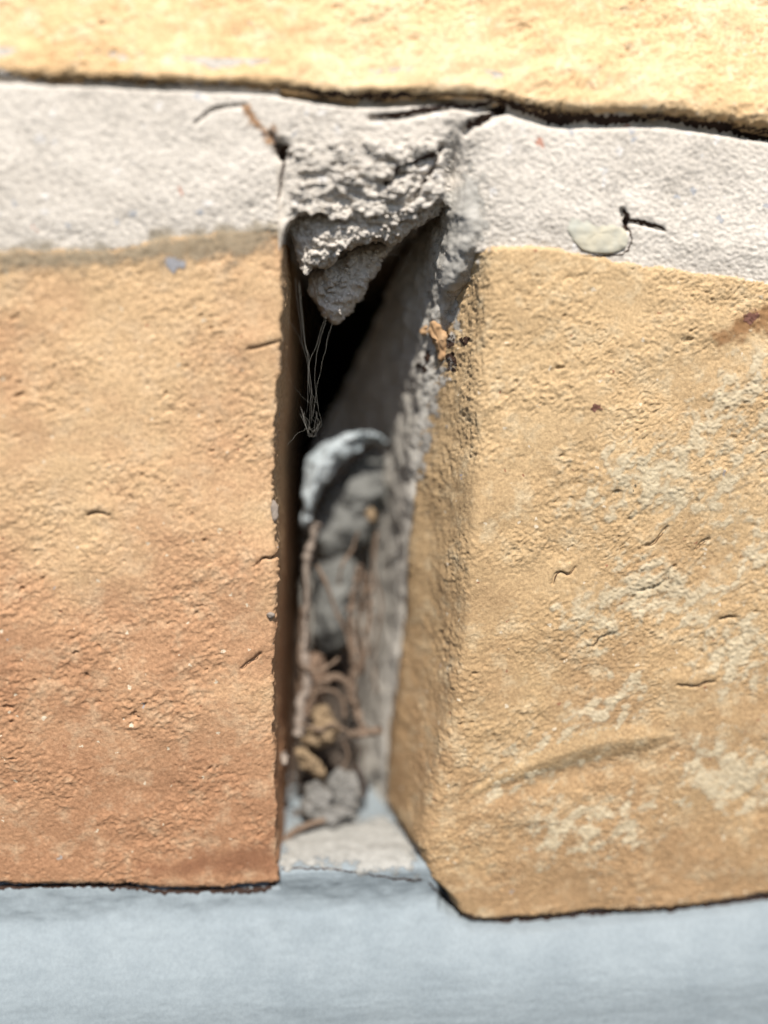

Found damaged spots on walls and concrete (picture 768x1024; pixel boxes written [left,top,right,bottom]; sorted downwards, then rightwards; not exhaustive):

spalling [287,143,313,159]
crack [278,155,286,201]
crack [581,209,667,257]
peeling [328,136,491,480]